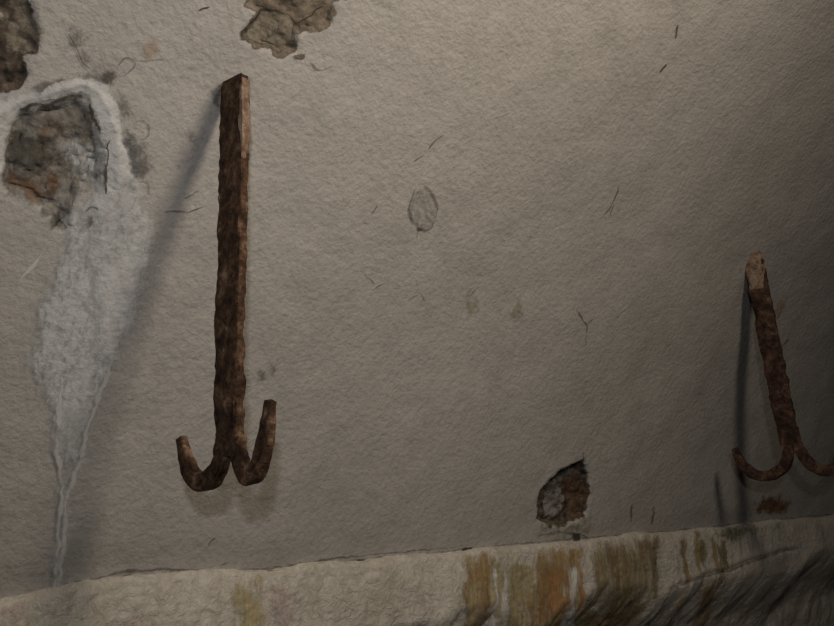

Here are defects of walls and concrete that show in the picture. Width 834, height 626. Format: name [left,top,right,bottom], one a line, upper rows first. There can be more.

flaking render [0,0,44,92]
flaking render [241,0,339,70]
flaking render [2,100,98,229]
water stain [0,71,156,588]
flaking render [536,455,590,541]
corrosion [459,535,659,626]
corrosion [677,532,728,626]